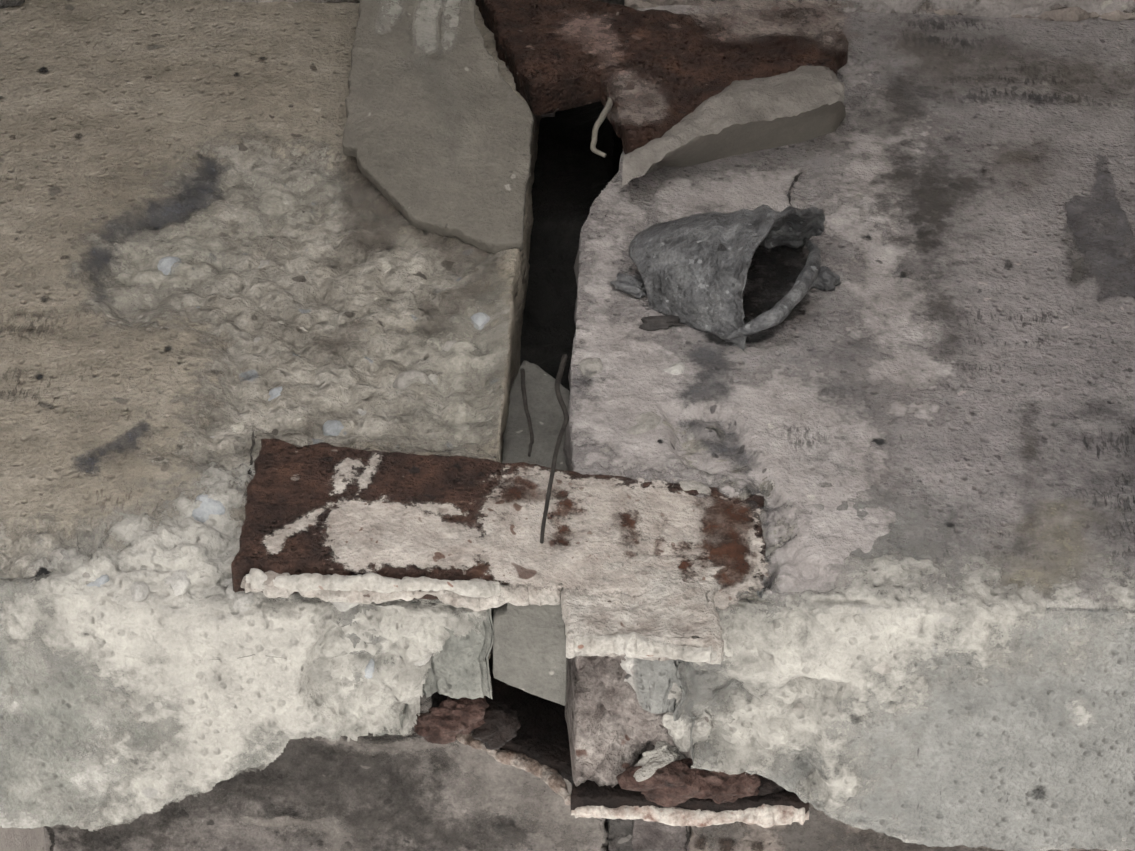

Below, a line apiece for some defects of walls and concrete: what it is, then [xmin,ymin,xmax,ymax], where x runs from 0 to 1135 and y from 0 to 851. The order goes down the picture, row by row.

corrosion [554,13,651,106]
damp [897,30,1135,102]
damp [860,77,992,250]
spalling [67,124,797,610]
corrosion [484,468,587,546]
corrosion [612,492,757,587]